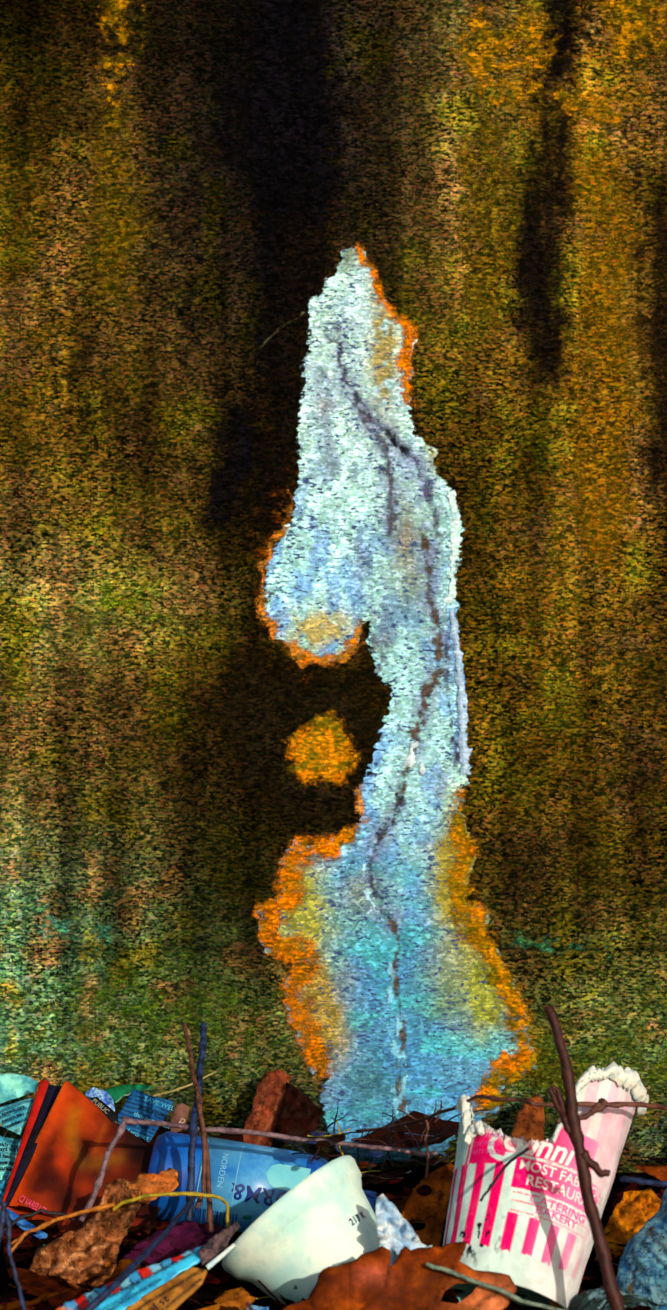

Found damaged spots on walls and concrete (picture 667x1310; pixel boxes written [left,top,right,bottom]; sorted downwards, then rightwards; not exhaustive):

damp [509,0,589,385]
corrosion [254,789,370,1077]
corrosion [288,712,358,785]
crack [261,312,461,1117]